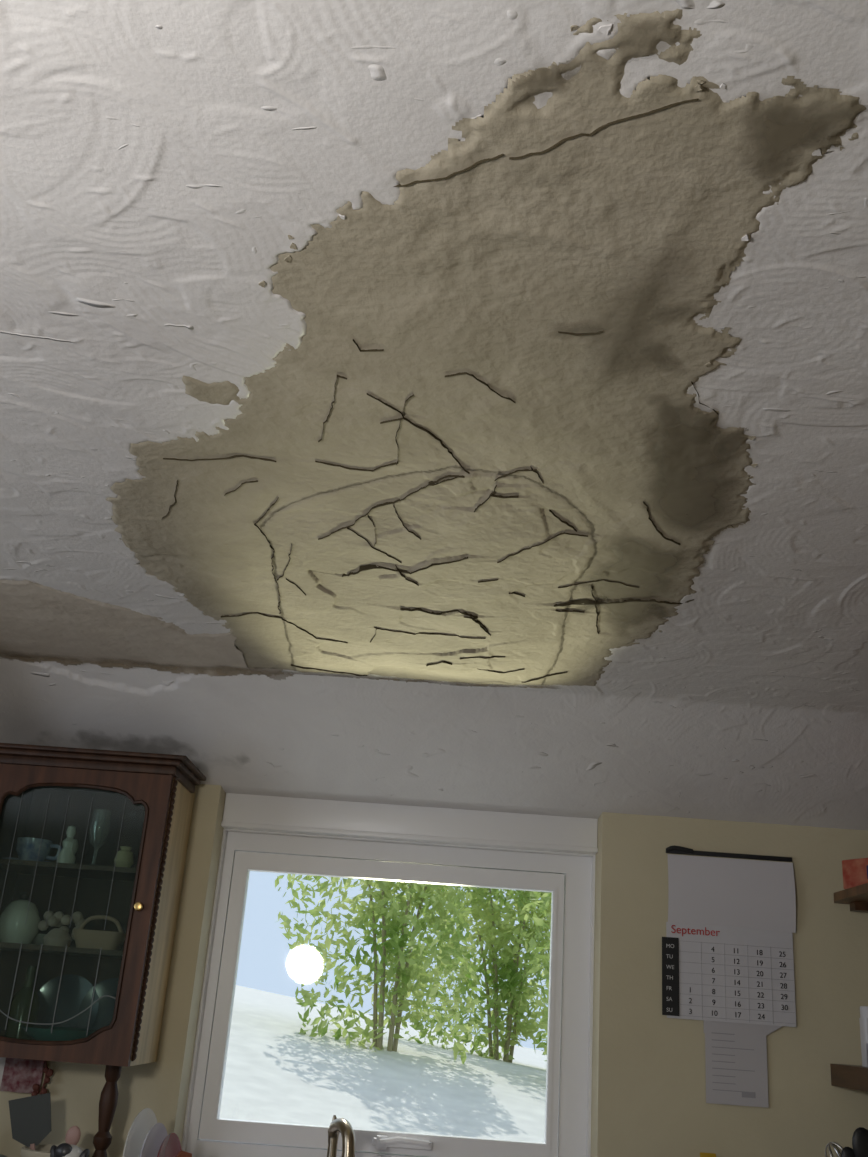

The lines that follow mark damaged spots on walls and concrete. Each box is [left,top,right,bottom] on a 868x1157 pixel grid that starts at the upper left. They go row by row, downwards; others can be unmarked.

crack [394,99,698,187]
crack [353,339,384,352]
spalling [0,9,867,686]
water stain [656,412,729,530]
crack [162,372,588,683]
crack [643,501,681,545]
crack [554,579,694,634]
water stain [589,540,680,627]